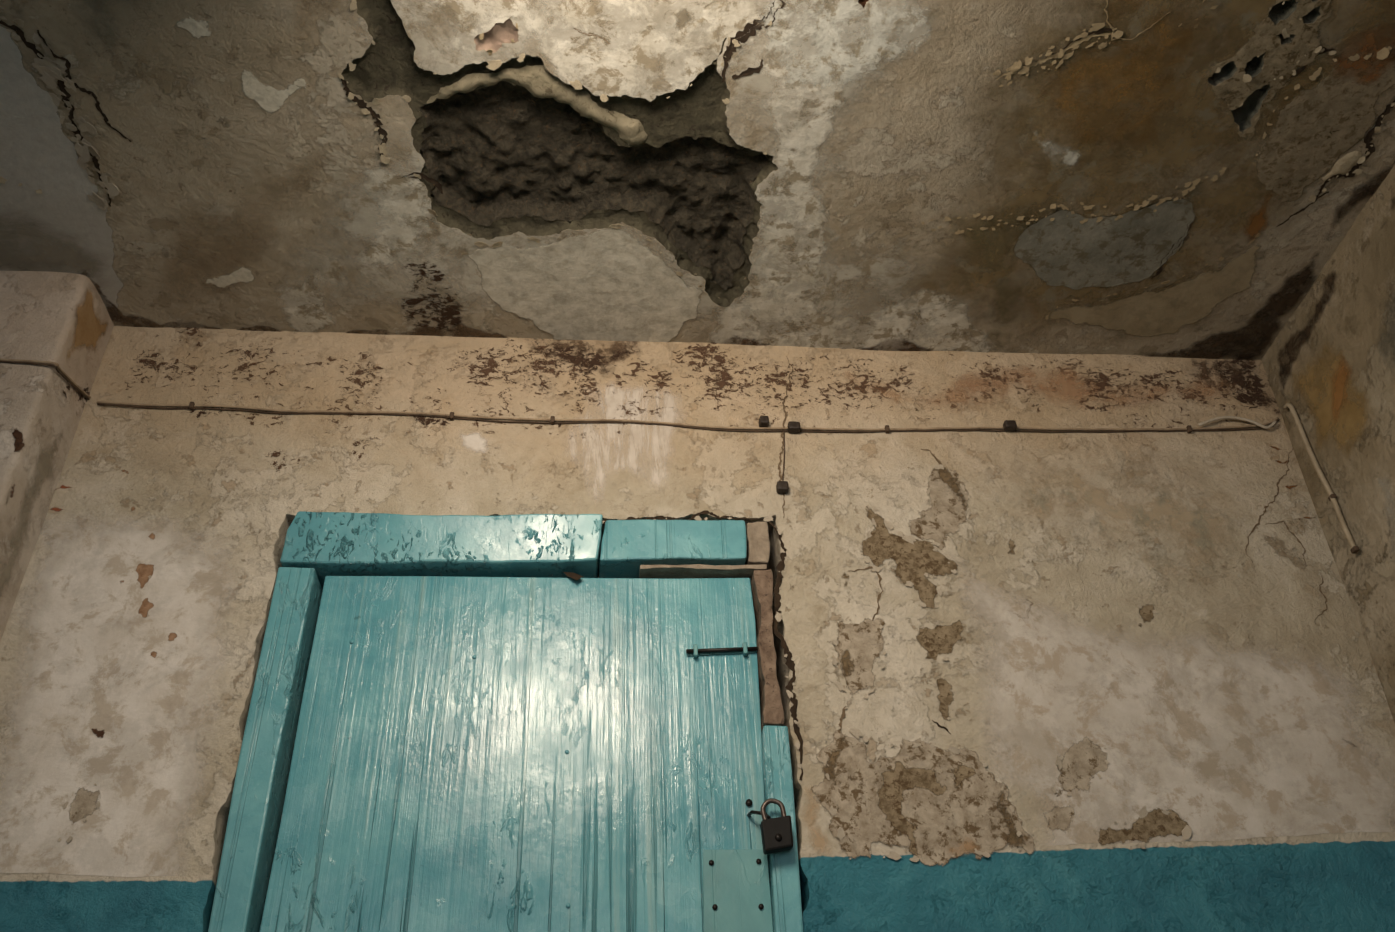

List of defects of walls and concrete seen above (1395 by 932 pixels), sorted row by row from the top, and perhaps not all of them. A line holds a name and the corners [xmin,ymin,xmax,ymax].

peeling [993,0,1219,87]
spalling [341,0,778,307]
damp [0,0,1395,495]
peeling [915,167,1260,337]
peeling [811,449,1109,866]
peeling [1135,604,1157,627]
crack [1245,449,1327,624]
peeling [1093,805,1192,849]